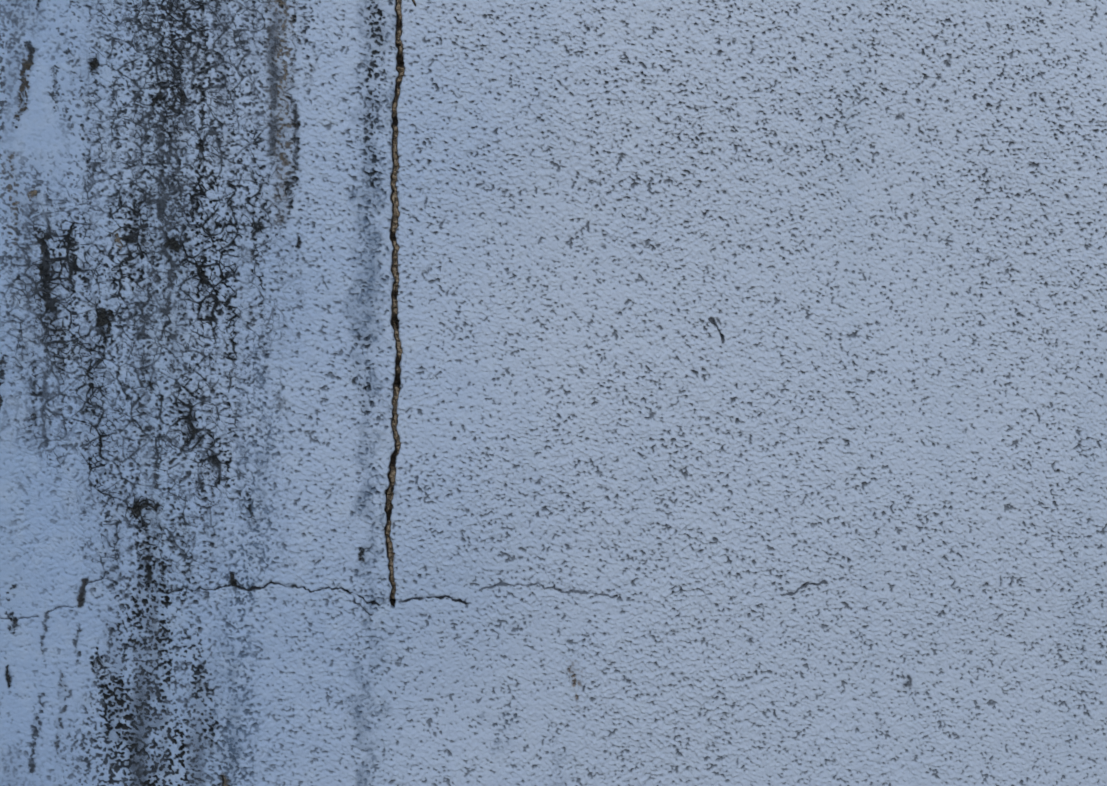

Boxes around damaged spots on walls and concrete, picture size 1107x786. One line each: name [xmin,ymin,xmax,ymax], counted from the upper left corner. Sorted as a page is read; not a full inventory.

water stain [5,585,18,634]
water stain [0,41,35,139]
water stain [16,0,284,786]
crack [157,0,609,615]